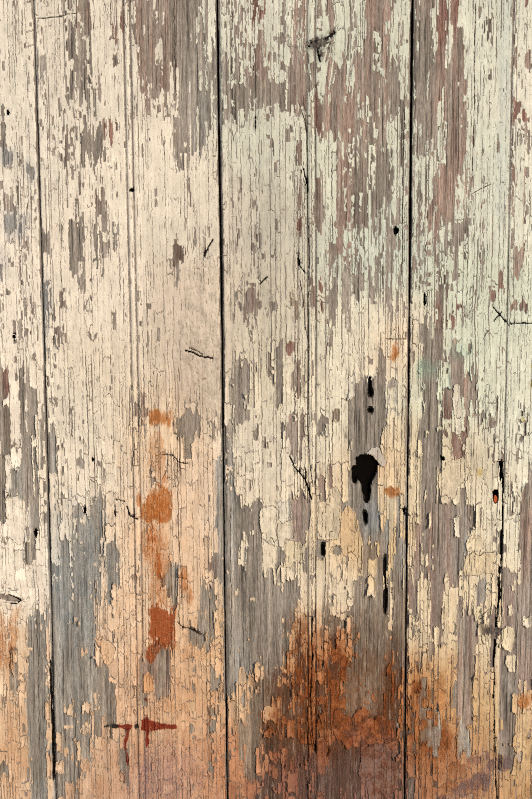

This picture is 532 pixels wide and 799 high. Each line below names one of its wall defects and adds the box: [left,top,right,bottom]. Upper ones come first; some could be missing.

peeling [28,0,120,171]
peeling [0,104,37,250]
peeling [110,0,532,799]
crack [483,307,532,339]
peeling [0,187,132,799]
corrosion [146,604,175,663]